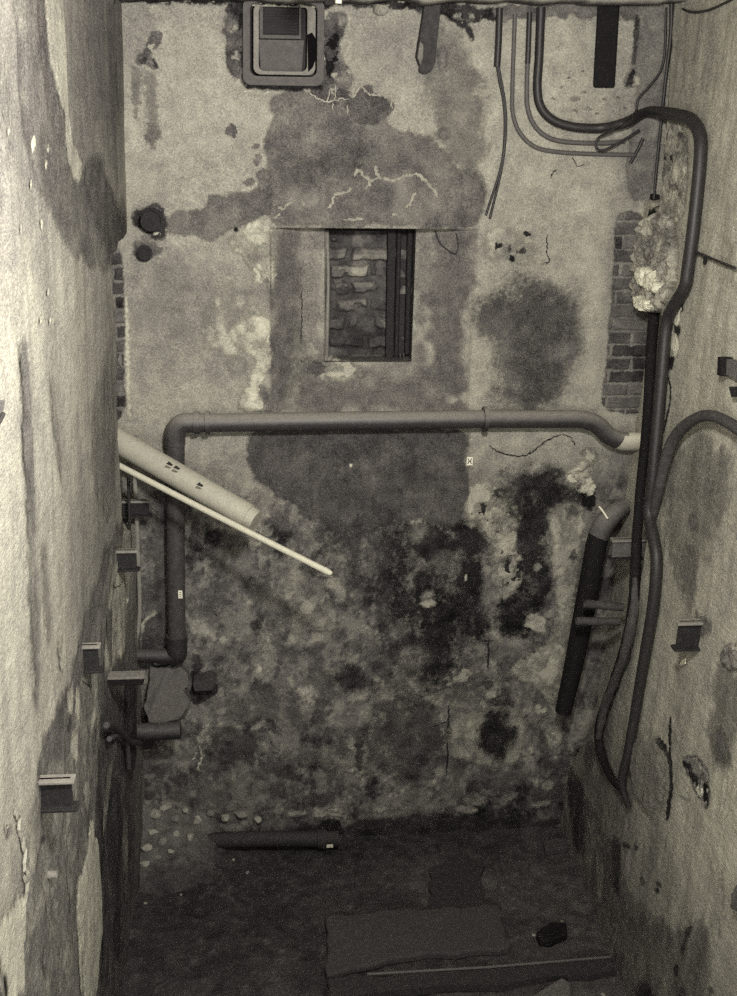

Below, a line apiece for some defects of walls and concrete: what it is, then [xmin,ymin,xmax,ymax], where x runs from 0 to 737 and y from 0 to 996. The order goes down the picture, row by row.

water stain [0,0,127,271]
water stain [166,171,272,240]
water stain [472,273,582,410]
flaking render [602,4,688,414]
water stain [20,341,52,703]
water stain [247,429,596,784]
water stain [708,663,737,766]
water stain [346,765,713,996]